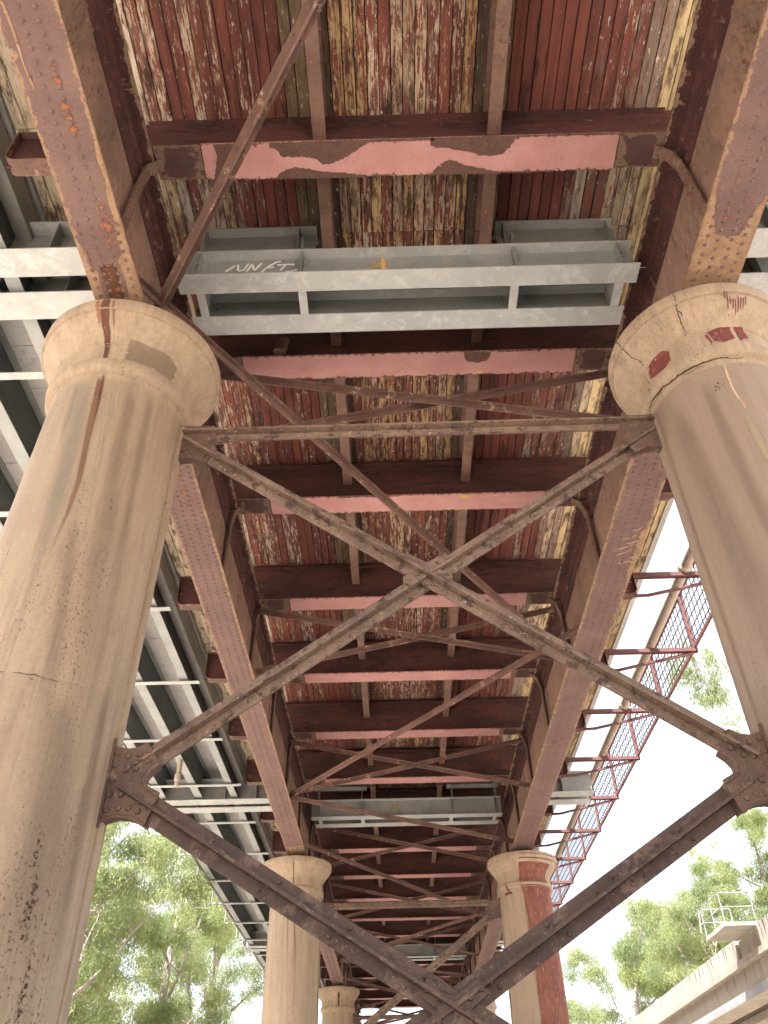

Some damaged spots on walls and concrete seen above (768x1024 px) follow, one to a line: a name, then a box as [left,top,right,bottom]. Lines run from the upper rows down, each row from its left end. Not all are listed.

peeling [213,144,234,181]
peeling [269,133,615,180]
crack [616,342,744,410]
corrosion [66,375,104,516]
peeling [505,852,553,931]
peeling [534,951,570,1024]